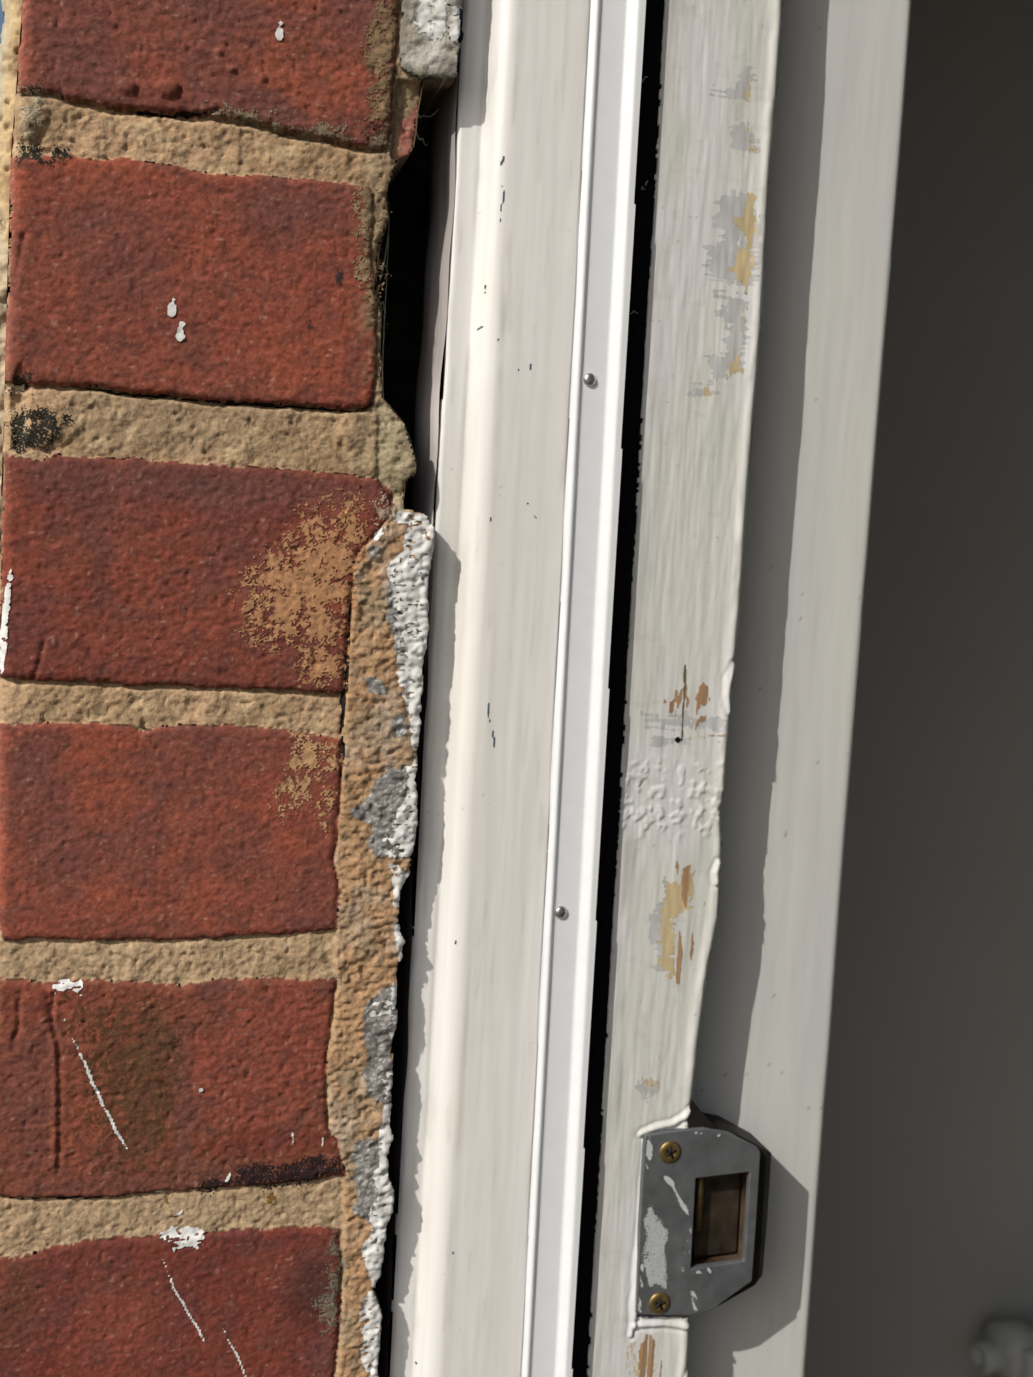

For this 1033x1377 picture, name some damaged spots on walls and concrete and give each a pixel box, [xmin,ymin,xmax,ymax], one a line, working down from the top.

peeling [413,0,461,42]
peeling [708,59,762,156]
peeling [687,189,763,401]
peeling [347,511,435,962]
peeling [640,664,728,747]
peeling [648,862,697,984]
peeling [349,983,398,1377]